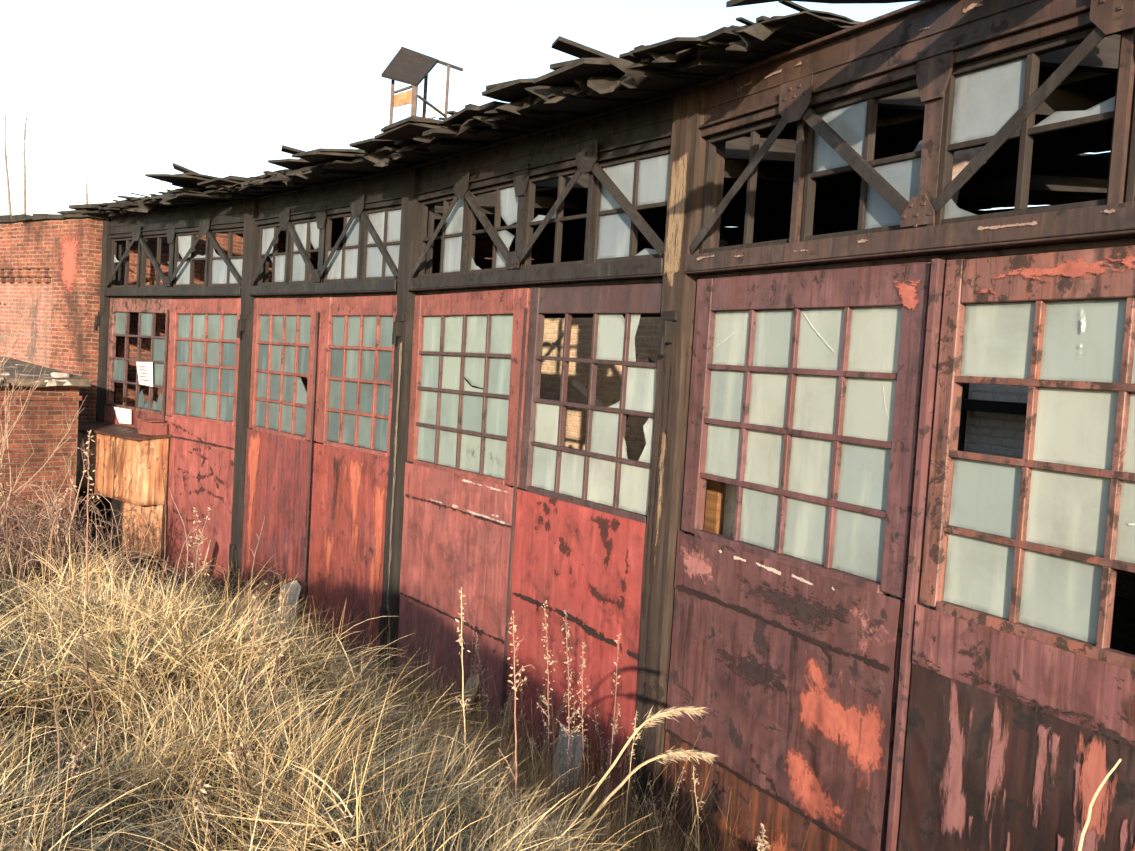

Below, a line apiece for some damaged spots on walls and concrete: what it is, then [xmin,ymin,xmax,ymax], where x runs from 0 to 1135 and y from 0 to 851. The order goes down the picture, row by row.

peeling [894,279,920,310]
peeling [976,255,1135,294]
peeling [716,633,886,788]
peeling [784,749,843,830]
peeling [940,681,973,837]
peeling [985,700,1009,846]
peeling [1033,724,1060,827]
peeling [1057,731,1117,851]
peeling [1120,820,1135,851]